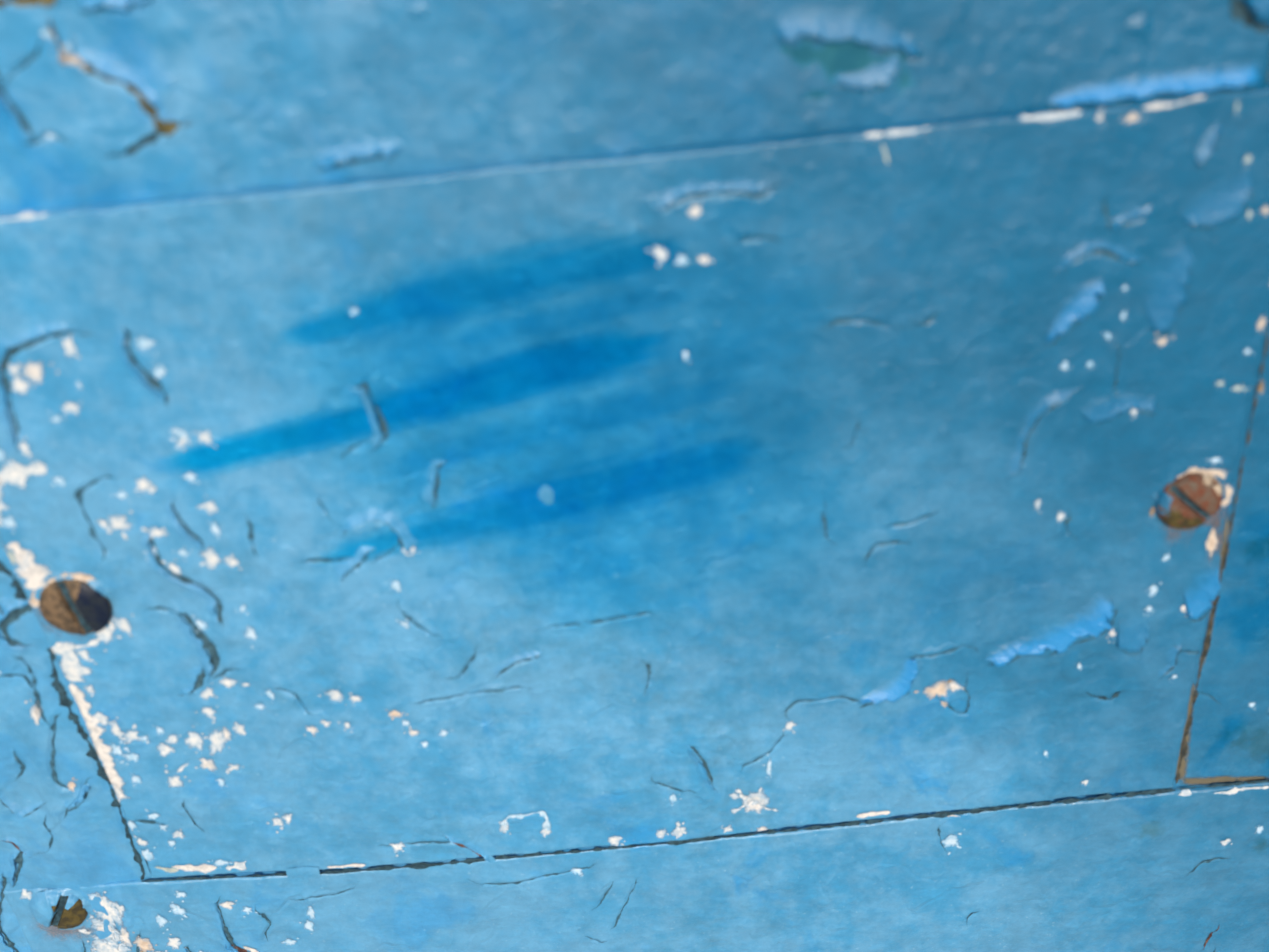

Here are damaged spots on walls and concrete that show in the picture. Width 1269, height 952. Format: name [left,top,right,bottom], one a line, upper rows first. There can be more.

crack [0,0,192,158]
peeling [774,5,922,107]
peeling [1019,61,1263,169]
crack [1231,0,1269,39]
crack [647,177,783,211]
crack [1050,191,1152,276]
spalling [0,437,96,608]
spalling [95,472,242,575]
crack [0,321,1269,952]
spalling [50,614,250,803]
spalling [127,809,247,874]
spalling [79,891,204,952]